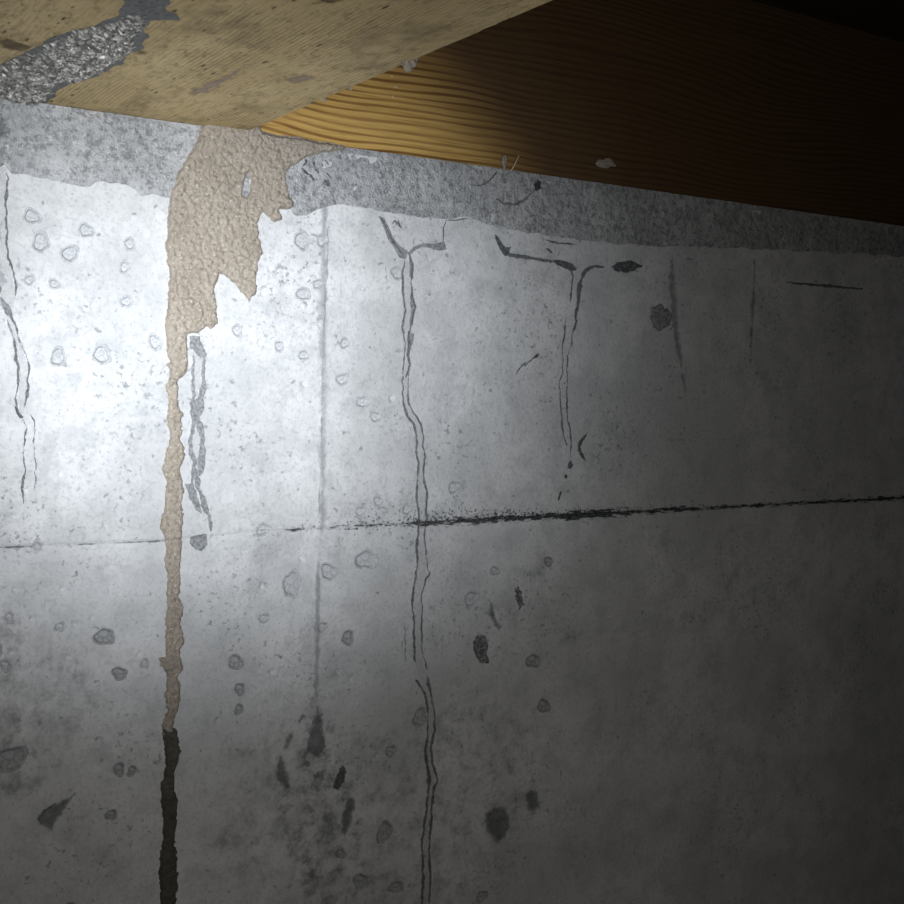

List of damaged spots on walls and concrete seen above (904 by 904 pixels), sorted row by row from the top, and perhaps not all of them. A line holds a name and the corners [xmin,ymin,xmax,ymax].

crack [0,173,37,504]
crack [283,216,904,904]
leakage [158,728,181,904]